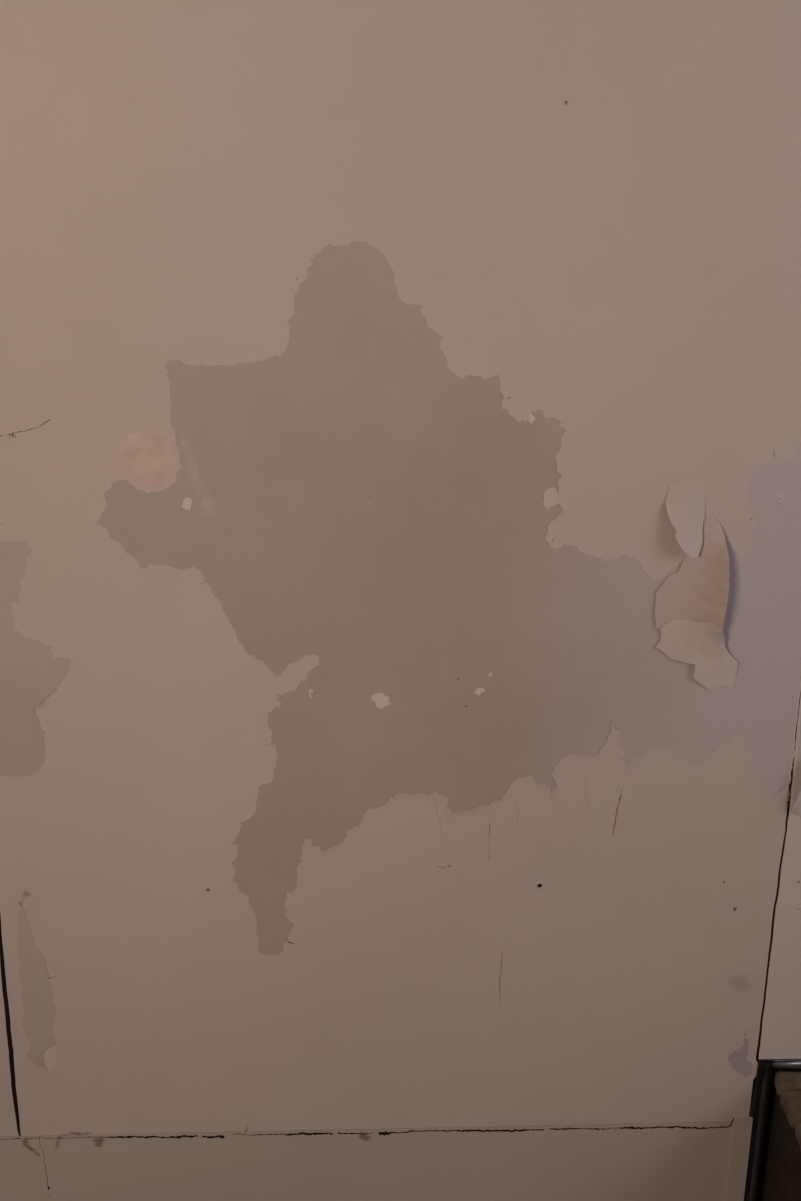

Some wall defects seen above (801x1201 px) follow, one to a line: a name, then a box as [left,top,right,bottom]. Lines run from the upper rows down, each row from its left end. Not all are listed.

peeling [88,233,801,961]
crack [0,914,734,1140]